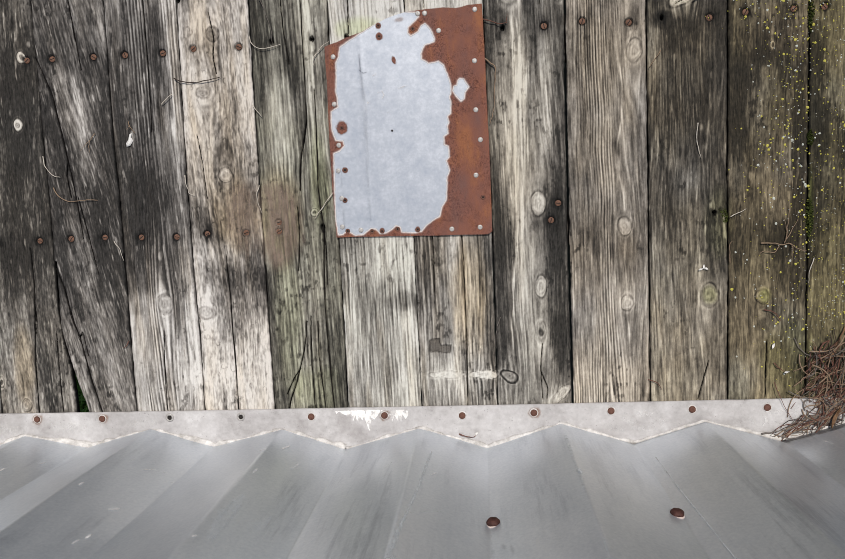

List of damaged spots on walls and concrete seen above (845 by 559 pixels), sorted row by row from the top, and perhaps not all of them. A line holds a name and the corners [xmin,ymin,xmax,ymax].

corrosion [324,4,492,238]
crack [31,252,103,413]